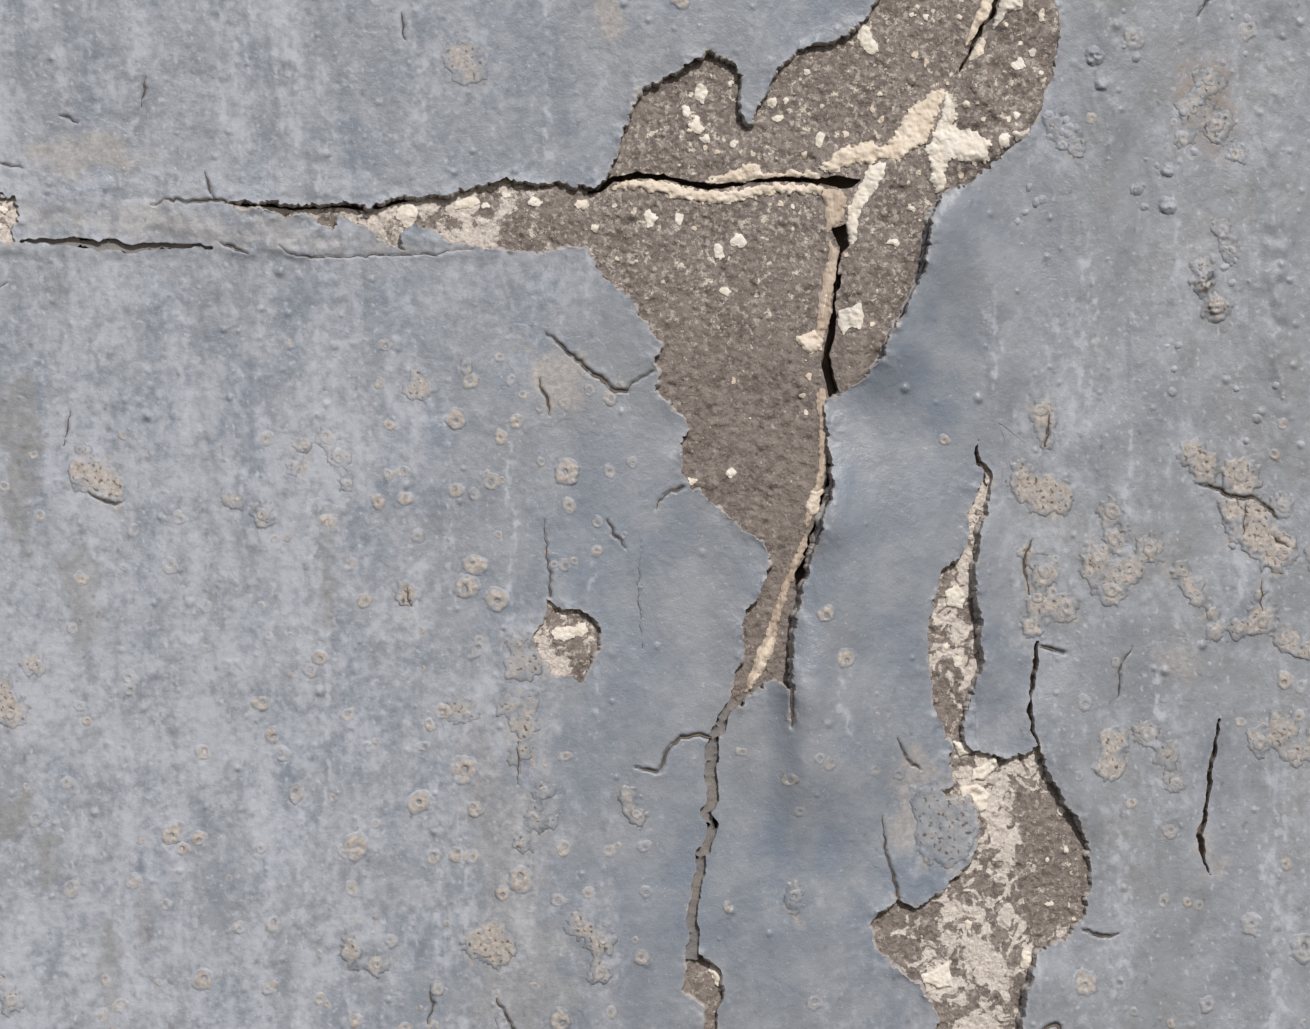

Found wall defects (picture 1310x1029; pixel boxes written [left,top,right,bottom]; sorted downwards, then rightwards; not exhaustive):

peeling [0,193,19,244]
crack [21,237,249,254]
crack [153,172,408,211]
crack [280,246,450,258]
crack [546,333,654,393]
peeling [230,0,1061,707]
crack [539,379,550,416]
crack [587,0,1023,960]
crack [1023,540,1032,595]
crack [1026,643,1064,742]
peeling [870,462,1090,1029]
crack [1196,724,1218,872]